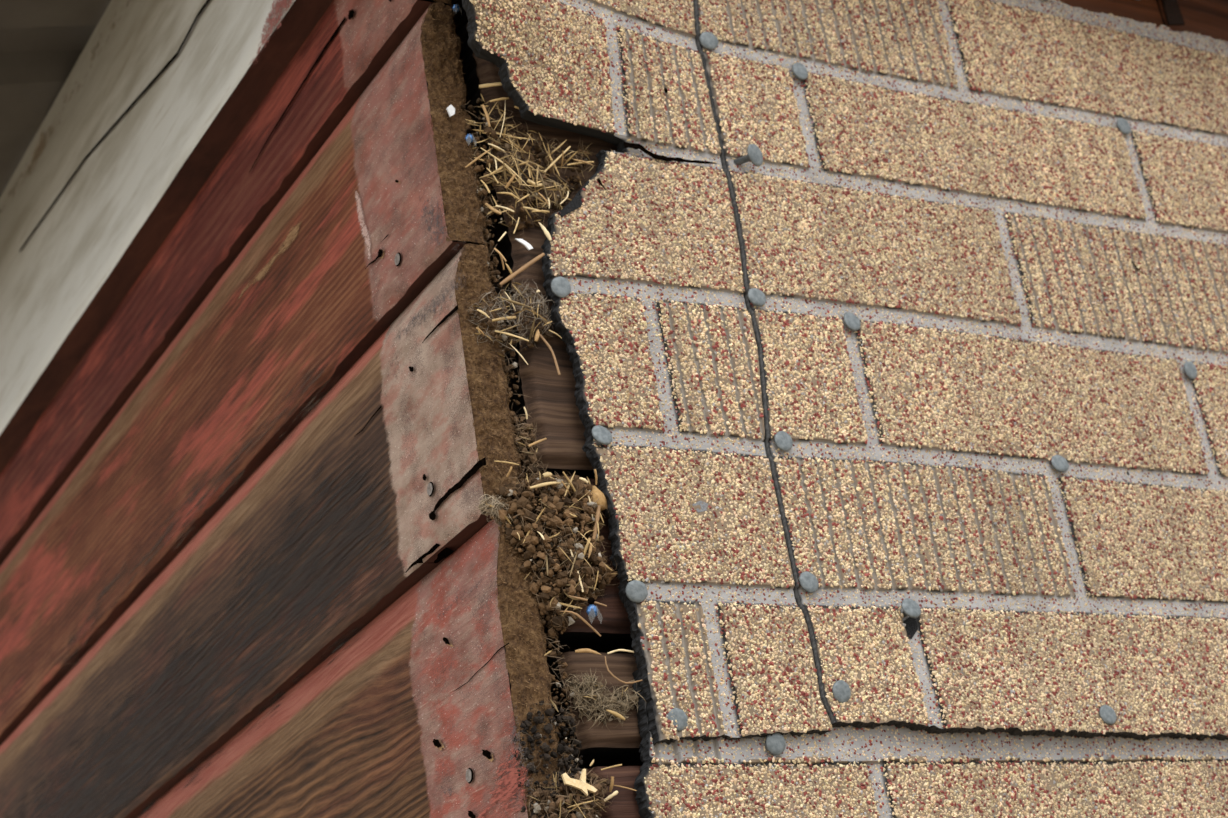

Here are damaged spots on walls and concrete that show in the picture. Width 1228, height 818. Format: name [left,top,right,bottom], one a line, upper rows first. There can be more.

crack [623,141,717,164]
crack [433,457,486,513]
crack [405,543,454,573]
peeling [477,747,527,818]